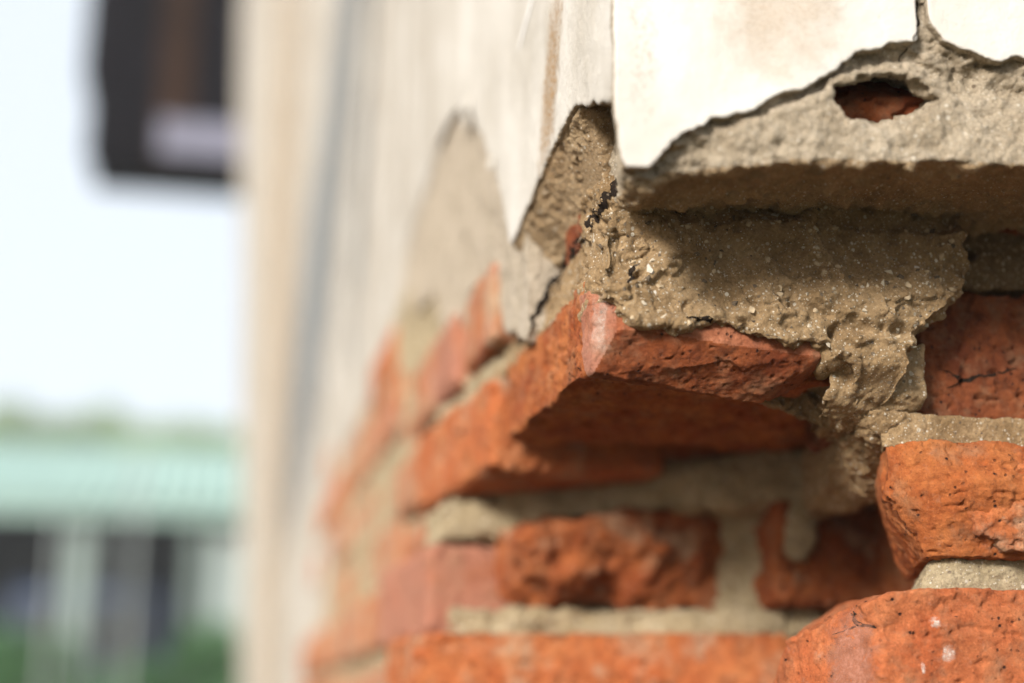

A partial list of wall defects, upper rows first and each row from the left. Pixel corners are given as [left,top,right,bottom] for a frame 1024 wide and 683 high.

crack [898,0,924,61]
spalling [399,0,1024,343]
crack [529,179,617,330]
spalling [579,291,821,403]
crack [938,368,1015,388]
spalling [967,500,1024,553]
spalling [828,614,874,683]